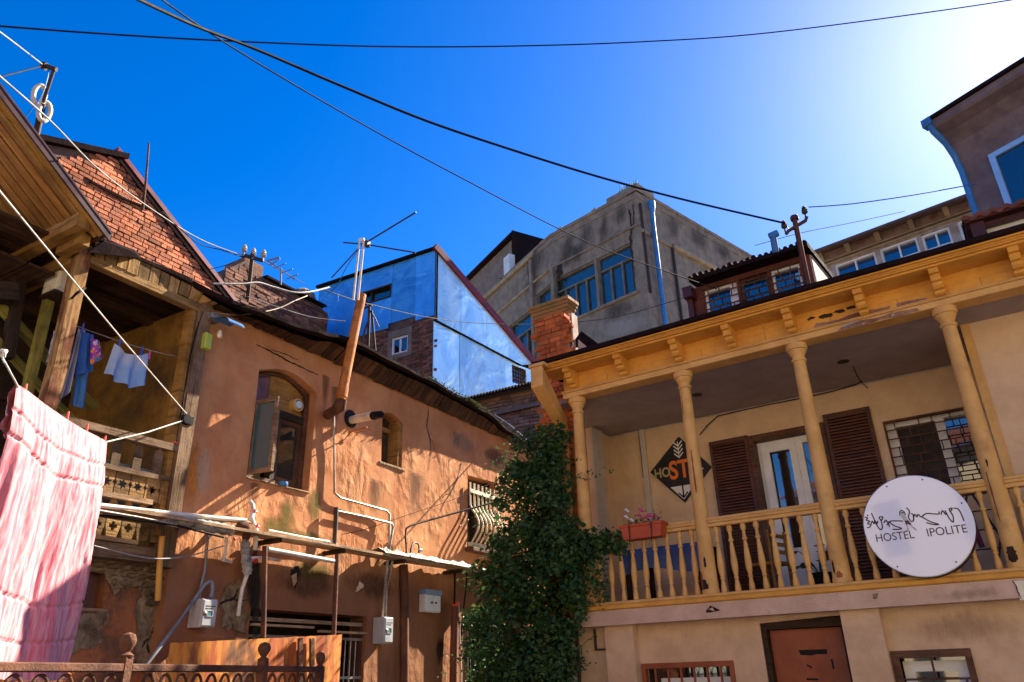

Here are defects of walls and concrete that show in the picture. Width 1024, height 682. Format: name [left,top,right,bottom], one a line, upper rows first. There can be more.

peeling [807,297,927,331]
crack [256,344,319,375]
spalling [219,578,251,635]
spalling [72,612,109,653]
spalling [133,588,156,675]